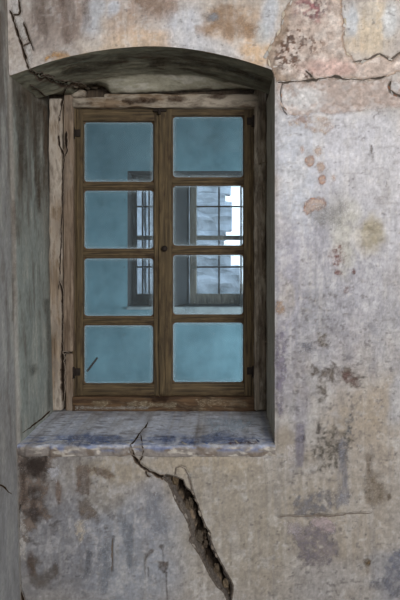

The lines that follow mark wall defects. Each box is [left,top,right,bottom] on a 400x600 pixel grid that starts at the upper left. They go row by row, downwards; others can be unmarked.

flaking render [264,0,400,116]
crack [278,71,400,114]
crack [354,52,400,62]
crack [9,0,87,402]
leakage [17,455,58,587]
crack [129,422,234,600]
crack [279,511,370,519]